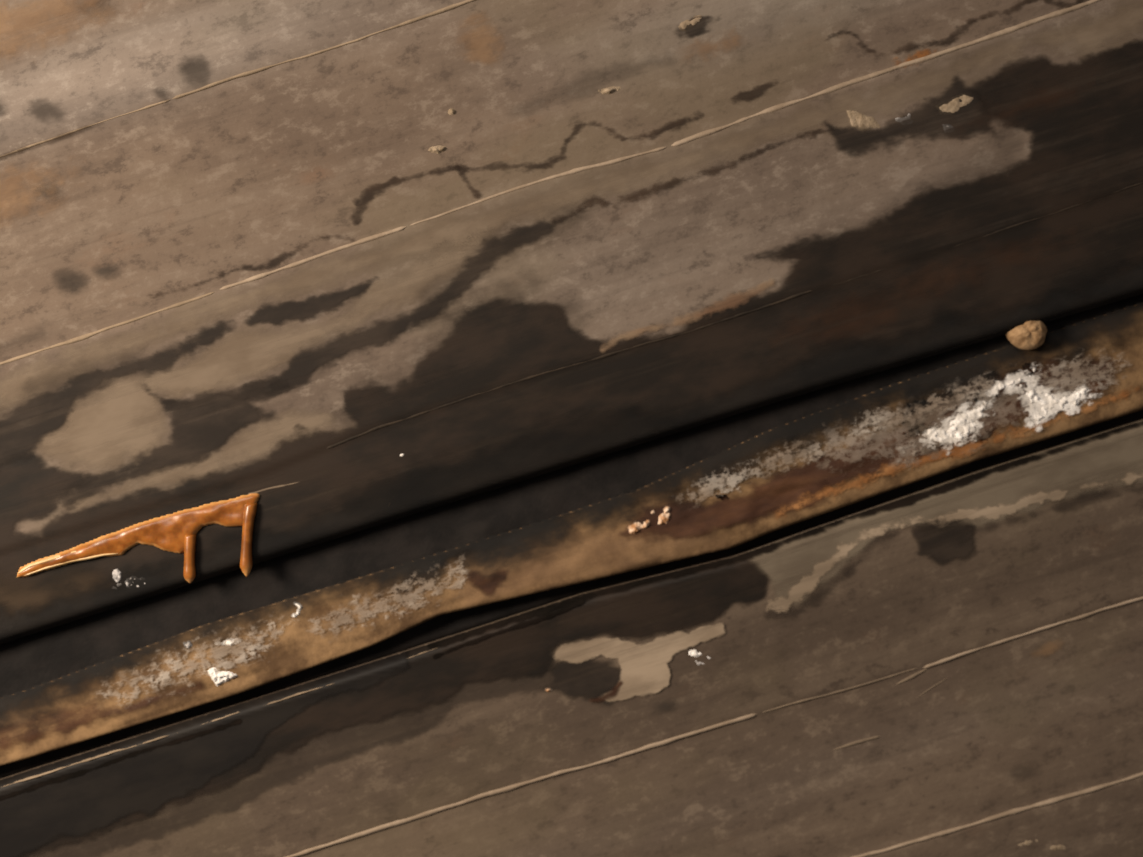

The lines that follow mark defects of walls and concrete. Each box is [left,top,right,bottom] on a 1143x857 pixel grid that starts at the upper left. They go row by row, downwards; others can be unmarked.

water stain [1010,0,1082,11]
peeling [846,110,881,130]
peeling [939,95,973,113]
water stain [0,4,1143,616]
rust [621,358,1138,538]
rust [469,571,506,595]
water stain [0,420,1143,857]
peeling [555,623,725,702]